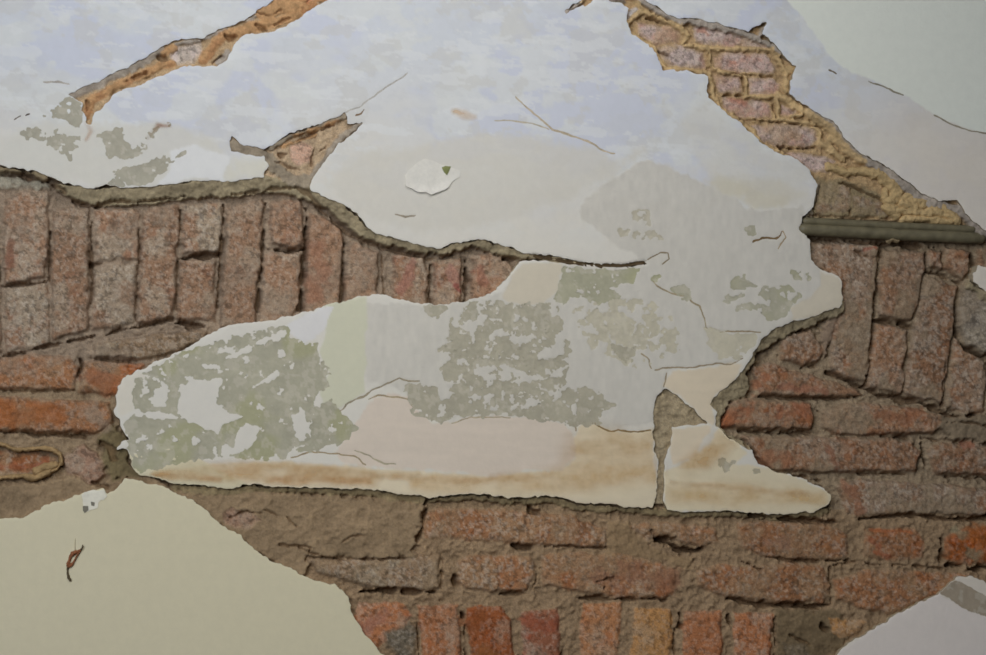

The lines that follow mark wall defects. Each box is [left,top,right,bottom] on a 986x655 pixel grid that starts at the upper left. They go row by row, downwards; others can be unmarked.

spalling [565,0,592,13]
peeling [20,97,83,162]
spalling [0,113,567,519]
peeling [403,300,617,428]
peeling [553,262,680,368]
spalling [609,0,986,522]
peeling [66,538,83,581]
spalling [120,389,986,655]